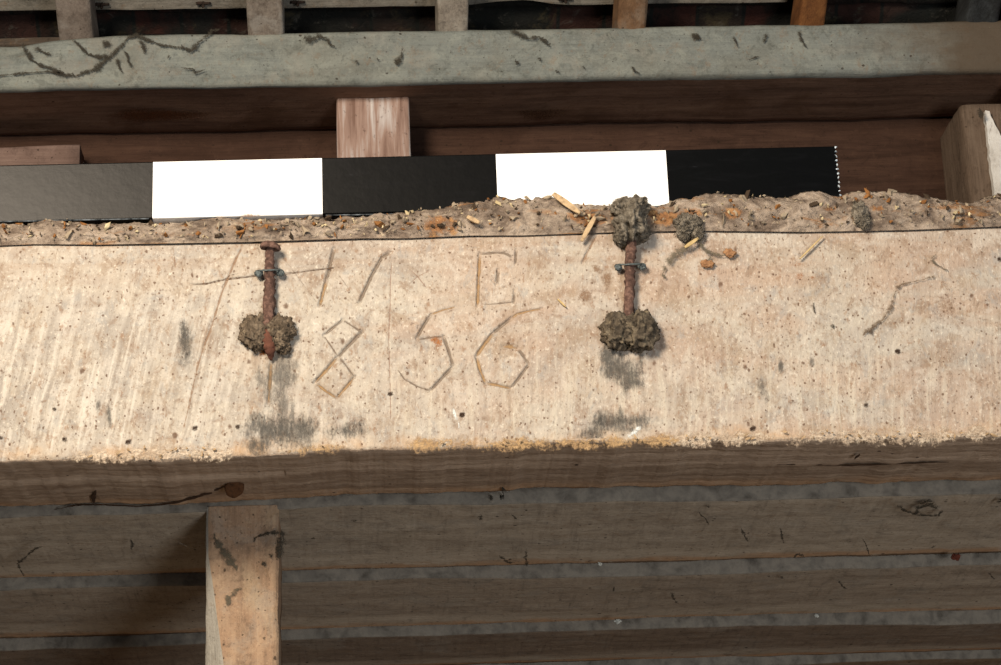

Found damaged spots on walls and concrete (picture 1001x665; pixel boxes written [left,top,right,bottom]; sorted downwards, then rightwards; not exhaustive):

leakage [601,346,641,391]
leakage [247,413,314,453]
leakage [581,414,645,442]
crack [55,487,223,510]